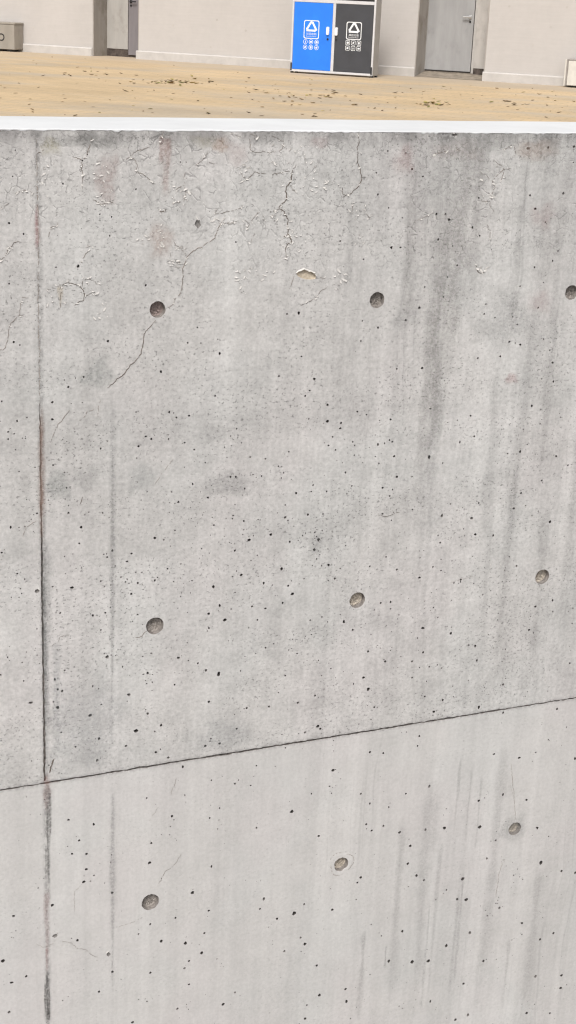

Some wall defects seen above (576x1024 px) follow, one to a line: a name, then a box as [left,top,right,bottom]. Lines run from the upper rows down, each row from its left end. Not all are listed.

crack [342,134,369,218]
crack [1,245,100,350]
crack [51,131,328,440]
peeling [296,268,317,279]